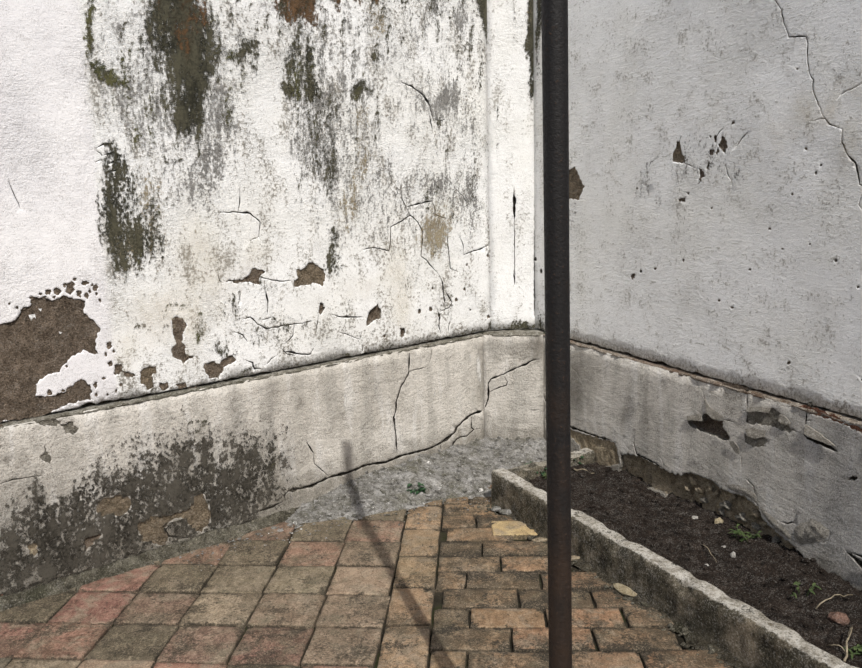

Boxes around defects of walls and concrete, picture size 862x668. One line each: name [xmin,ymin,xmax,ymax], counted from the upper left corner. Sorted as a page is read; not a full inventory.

water stain [86,0,488,282]
crack [775,0,862,209]
flaking render [0,278,197,435]
flaking render [203,355,236,379]
crack [224,188,260,241]
water stain [209,293,310,360]
flaking render [226,262,325,287]
crack [235,293,363,369]
crack [364,188,489,330]
crack [245,352,538,522]
spalling [571,430,796,549]
peeling [687,388,797,467]